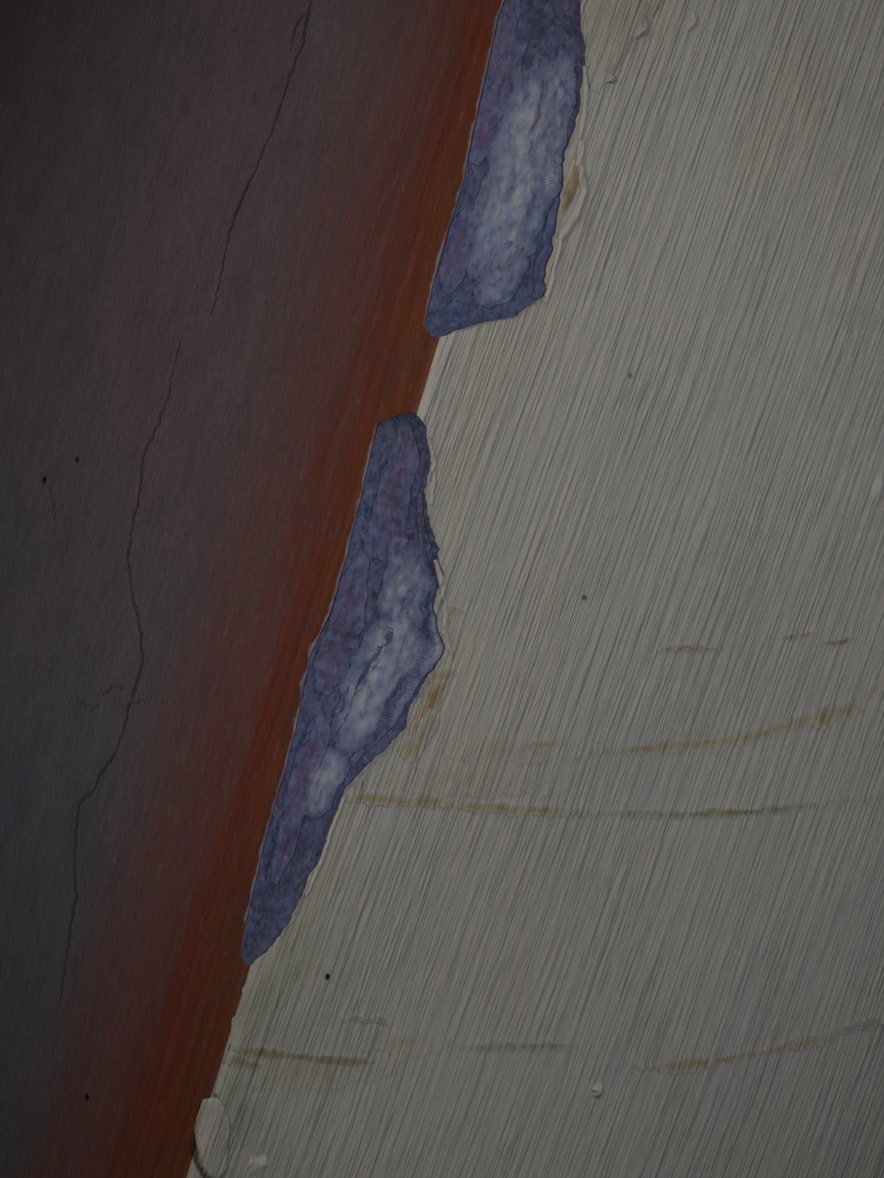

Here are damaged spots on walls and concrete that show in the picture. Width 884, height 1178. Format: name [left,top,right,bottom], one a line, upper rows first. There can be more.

crack [208,0,311,316]
spalling [422,0,589,339]
crack [57,341,180,1005]
spalling [240,413,453,967]
rust [399,668,456,762]